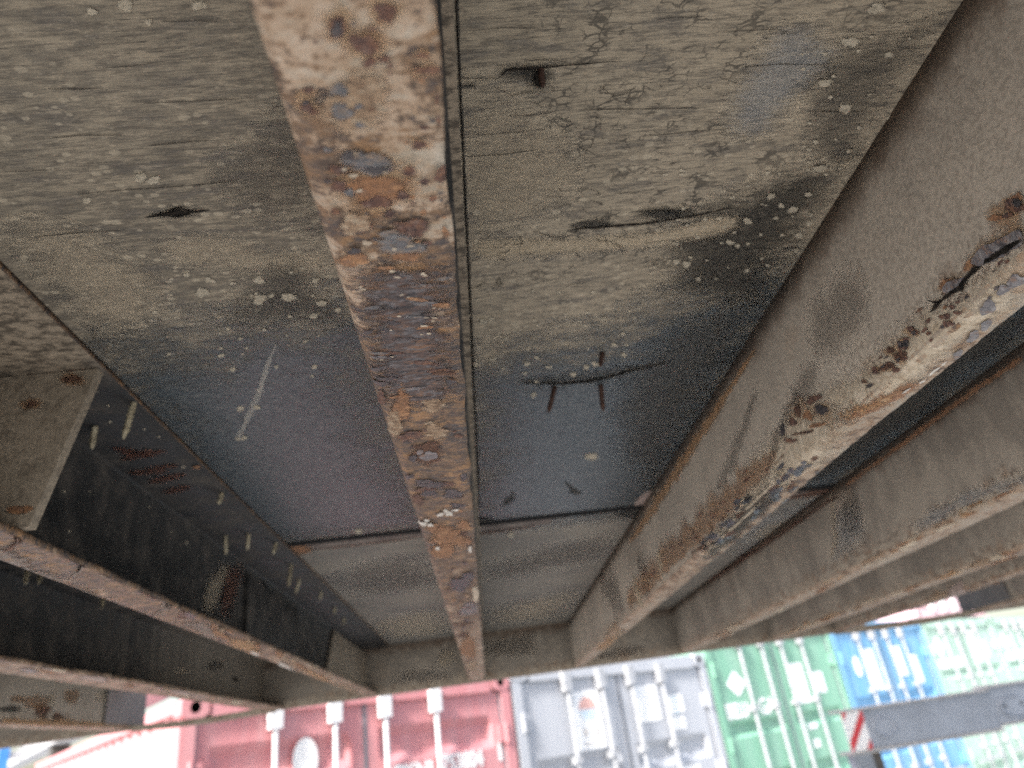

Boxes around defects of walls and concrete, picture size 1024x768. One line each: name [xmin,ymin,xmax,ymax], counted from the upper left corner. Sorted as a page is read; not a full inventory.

rust [326,0,402,75]
leakage [841,36,873,53]
crack [157,96,247,104]
leakage [818,75,851,114]
crack [81,181,235,218]
crack [457,55,830,289]
leakage [455,0,841,537]
rust [323,150,463,466]
leakage [111,267,420,542]
crack [524,352,661,413]
rust [779,296,968,443]
rust [0,534,107,600]